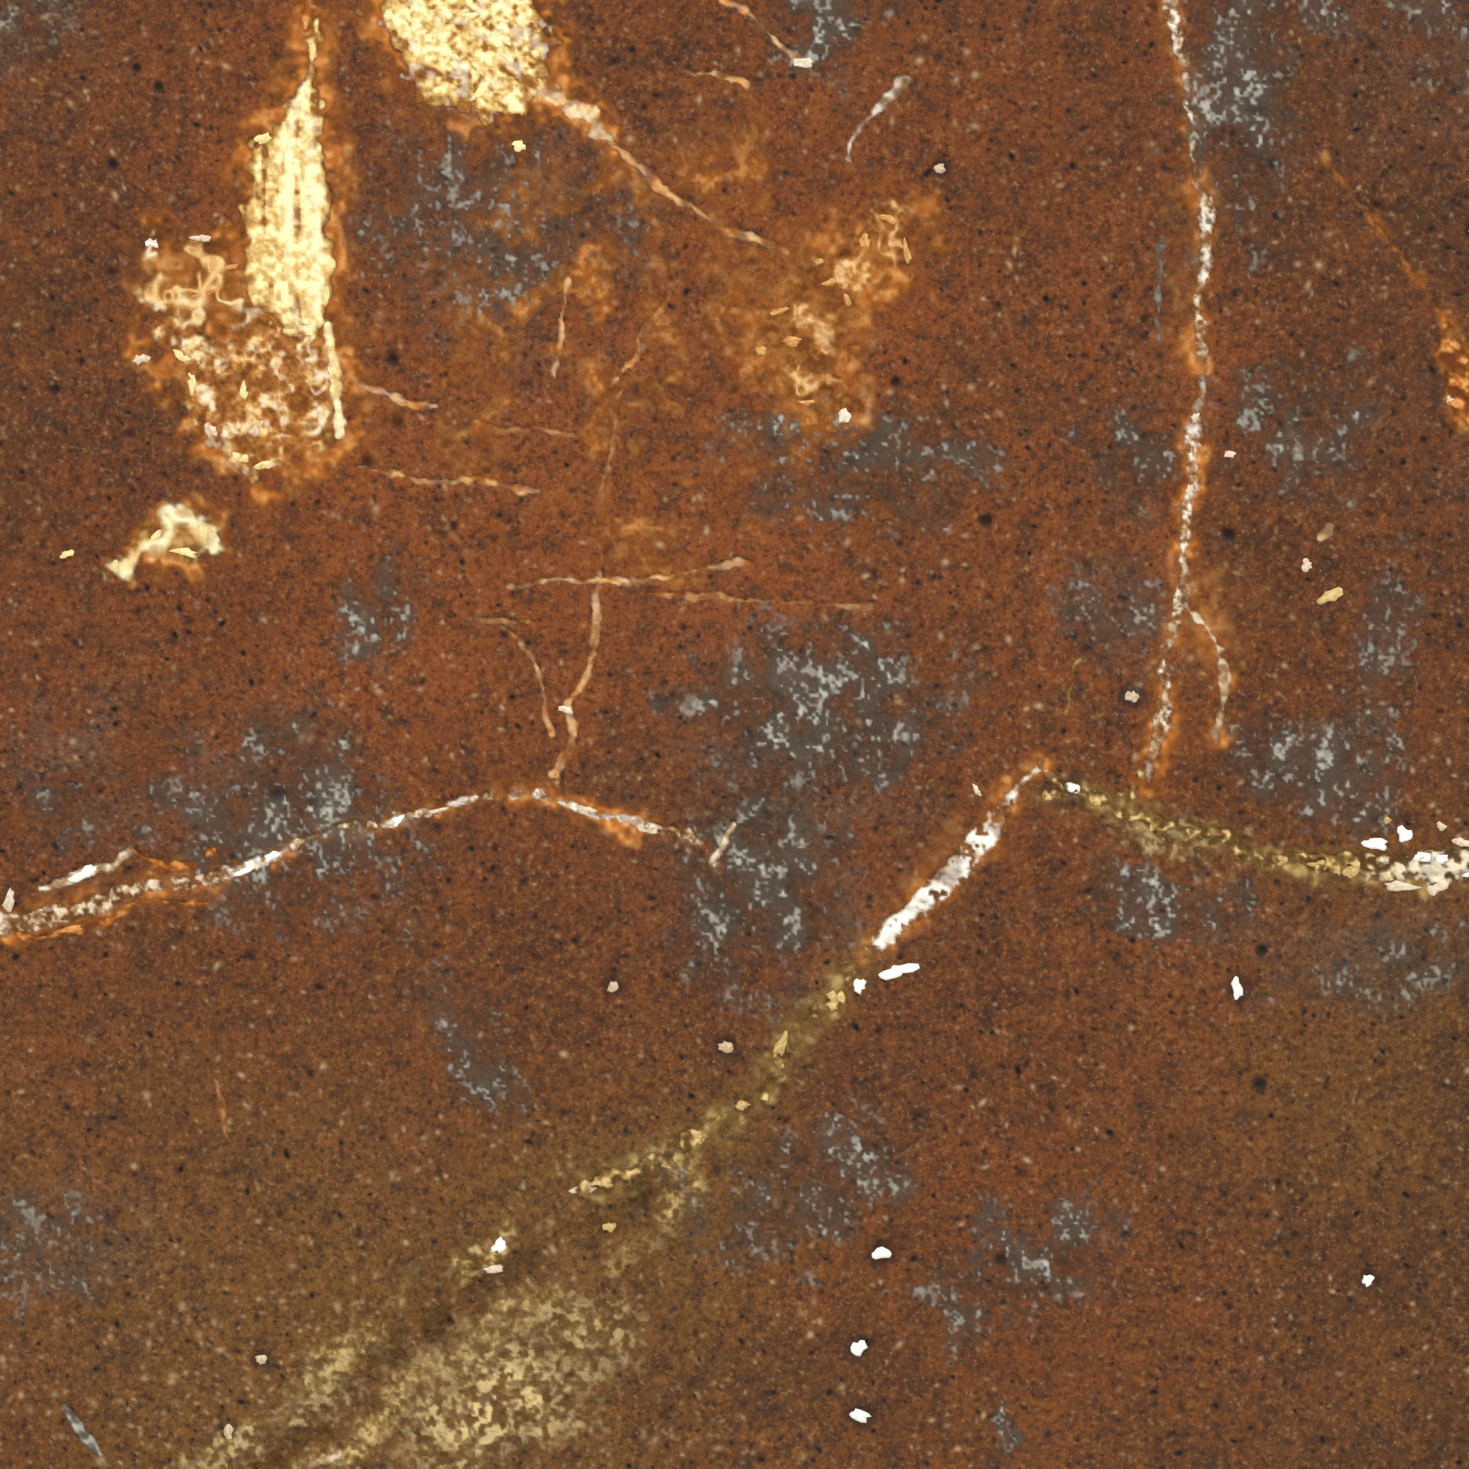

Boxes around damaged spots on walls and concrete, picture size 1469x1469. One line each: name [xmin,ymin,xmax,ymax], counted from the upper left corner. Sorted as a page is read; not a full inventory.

peeling [358,0,620,161]
corrosion [679,140,767,192]
peeling [124,0,372,507]
corrosion [558,242,610,324]
corrosion [714,281,783,374]
peeling [109,495,230,588]
crack [569,0,1469,1260]
crack [0,782,736,945]
damp [1110,862,1187,939]
damp [758,1117,908,1239]
crack [291,1224,558,1469]
crack [64,1411,102,1455]